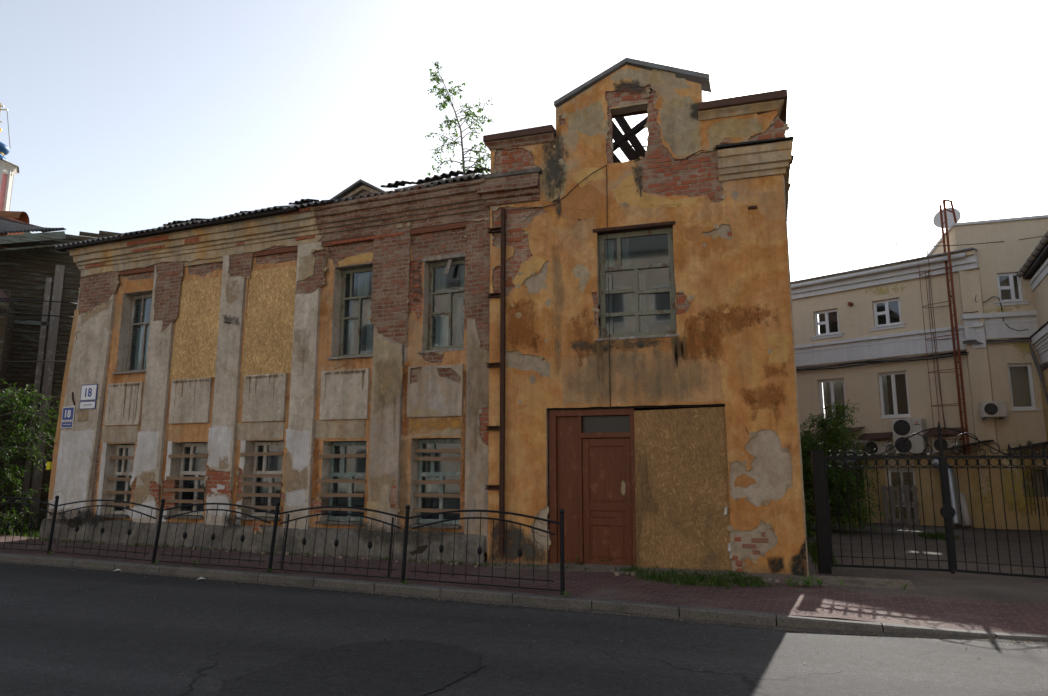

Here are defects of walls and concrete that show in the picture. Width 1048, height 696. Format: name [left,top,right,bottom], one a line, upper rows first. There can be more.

flaking render [48,67,793,519]
flaking render [529,506,551,550]
flaking render [727,520,778,572]